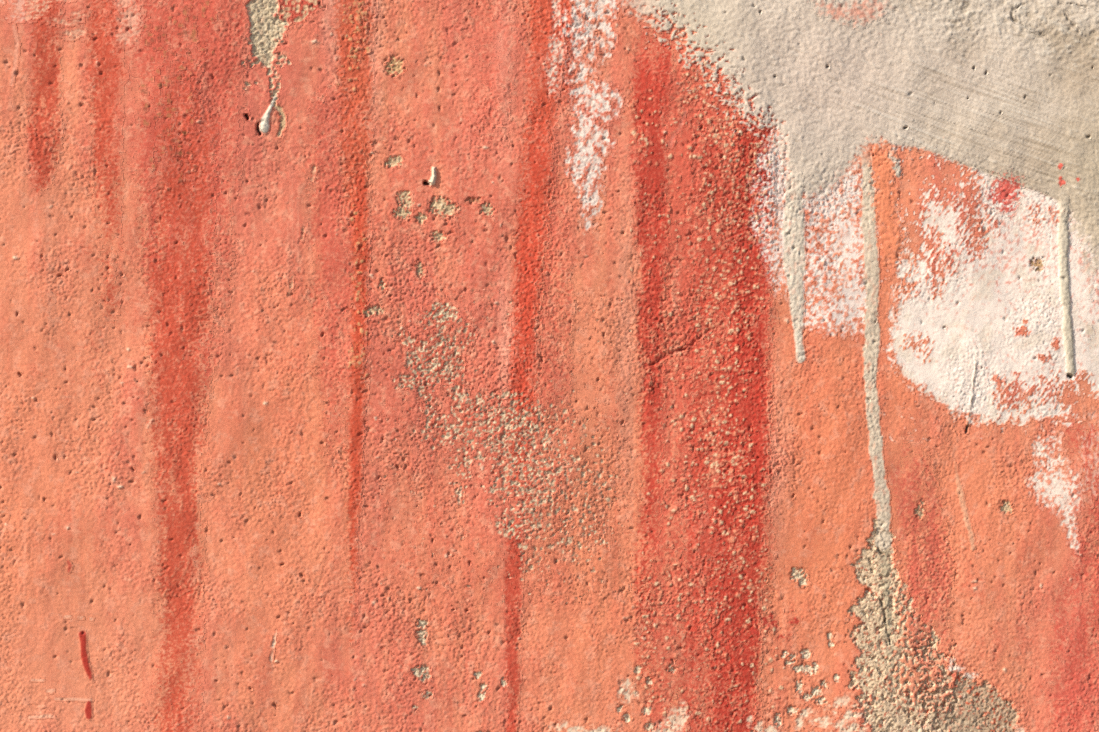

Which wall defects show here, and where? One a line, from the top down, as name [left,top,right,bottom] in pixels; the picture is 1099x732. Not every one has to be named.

leakage [82,0,251,732]
spalling [241,0,320,138]
peeling [336,0,371,92]
leakage [466,0,576,458]
peeling [347,0,1027,732]
leakage [627,16,781,732]
leakage [502,539,527,732]